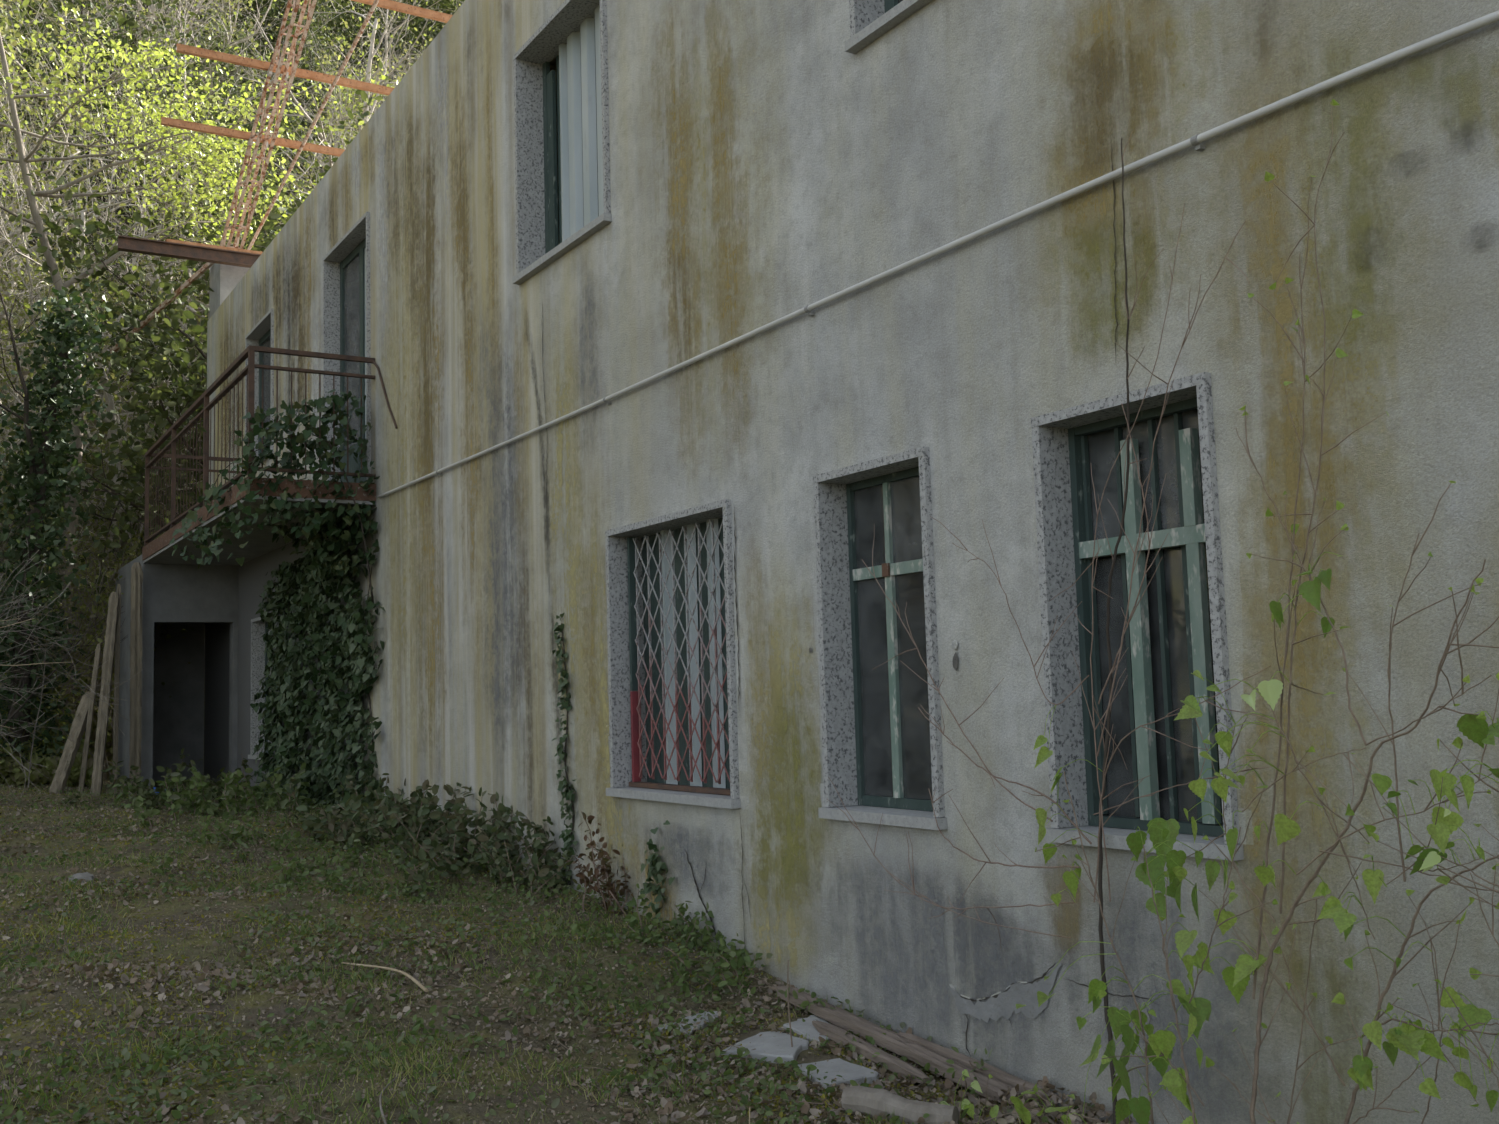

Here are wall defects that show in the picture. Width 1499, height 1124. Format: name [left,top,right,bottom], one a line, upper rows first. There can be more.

leakage [252,226,320,416]
leakage [346,122,441,709]
leakage [446,149,472,293]
leakage [464,317,635,862]
leakage [751,629,817,967]